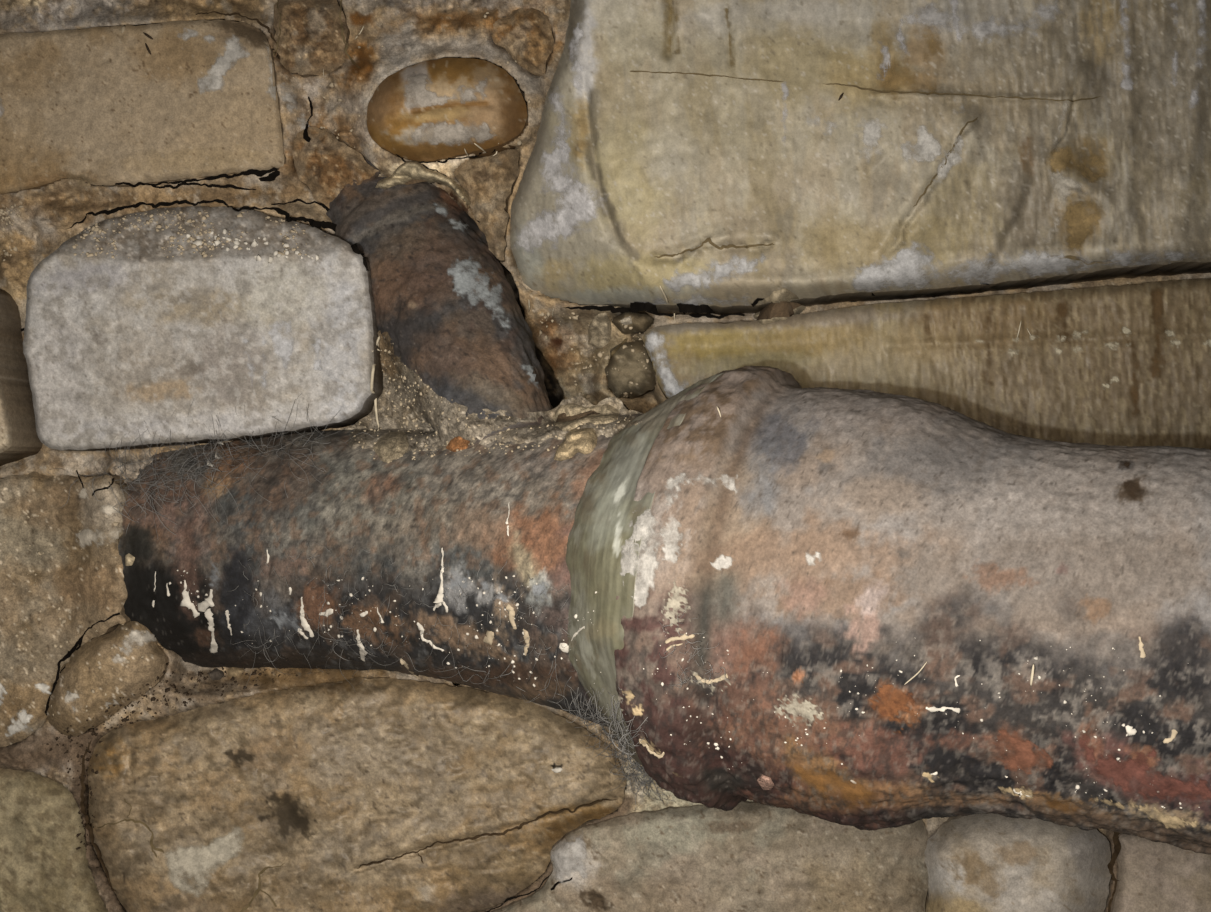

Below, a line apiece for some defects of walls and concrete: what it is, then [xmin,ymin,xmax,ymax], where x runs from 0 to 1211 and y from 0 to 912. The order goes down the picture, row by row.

crack [630,71,783,82]
crack [67,167,369,271]
damp [667,473,737,503]
corrosion [1119,461,1139,498]
damp [620,509,682,607]
damp [710,555,732,570]
damp [661,582,690,651]
crack [44,613,120,715]
damp [775,694,826,726]
corrosion [870,685,915,733]
corrosion [997,730,1053,774]
crack [357,799,617,869]